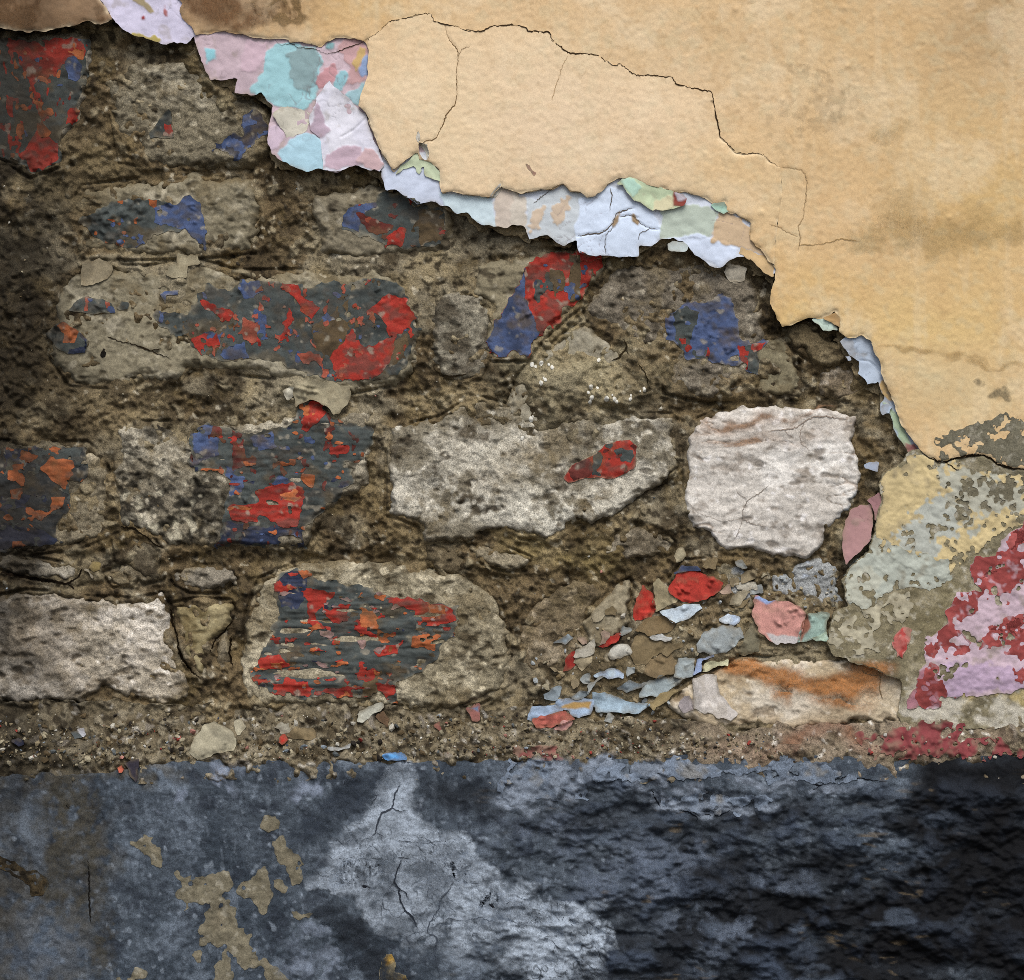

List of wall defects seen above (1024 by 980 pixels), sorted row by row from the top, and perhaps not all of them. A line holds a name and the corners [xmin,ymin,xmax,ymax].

peeling [0,37,91,174]
spalling [101,0,776,359]
crack [276,13,856,253]
peeling [46,258,129,354]
peeling [78,195,422,549]
peeling [665,293,769,375]
peeling [0,445,89,553]
peeling [527,313,1024,762]
peeling [250,568,459,728]
peeling [382,752,407,761]
peeling [174,815,304,980]
crack [370,786,496,976]